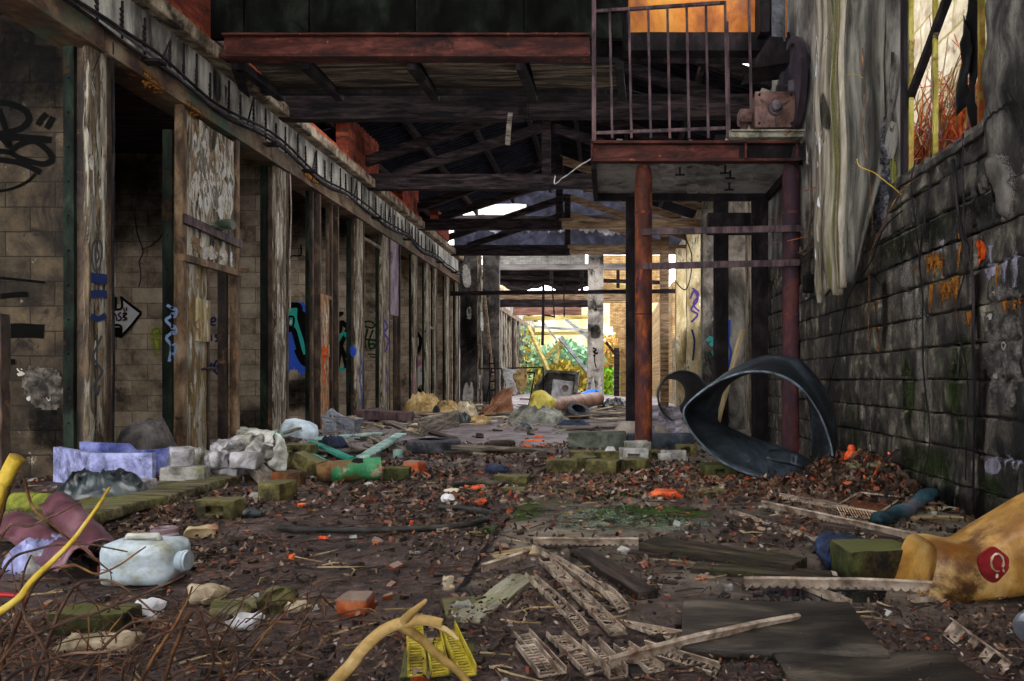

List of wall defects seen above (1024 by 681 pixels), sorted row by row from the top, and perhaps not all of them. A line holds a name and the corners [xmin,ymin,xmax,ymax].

peeling [188,125,234,219]
peeling [191,235,233,267]
damp [909,222,1024,519]